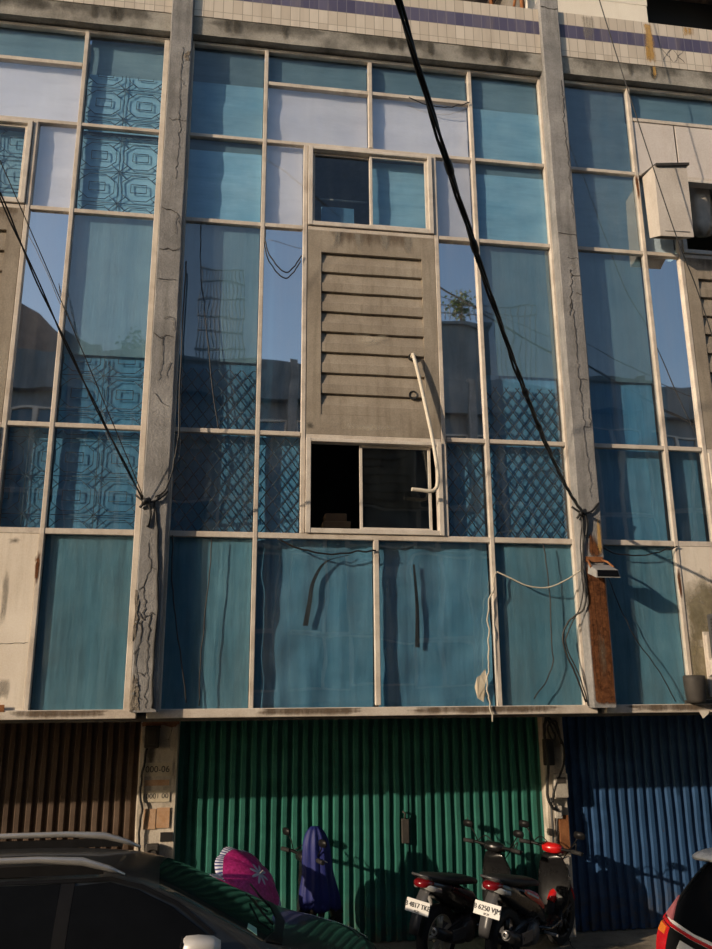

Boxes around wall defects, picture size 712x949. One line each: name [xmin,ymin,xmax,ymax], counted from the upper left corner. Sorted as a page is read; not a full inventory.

crack [153,316,175,406]
spalling [129,674,140,713]
spalling [132,589,140,642]
crack [133,546,155,709]
rust [586,567,616,704]
water stain [629,584,712,710]